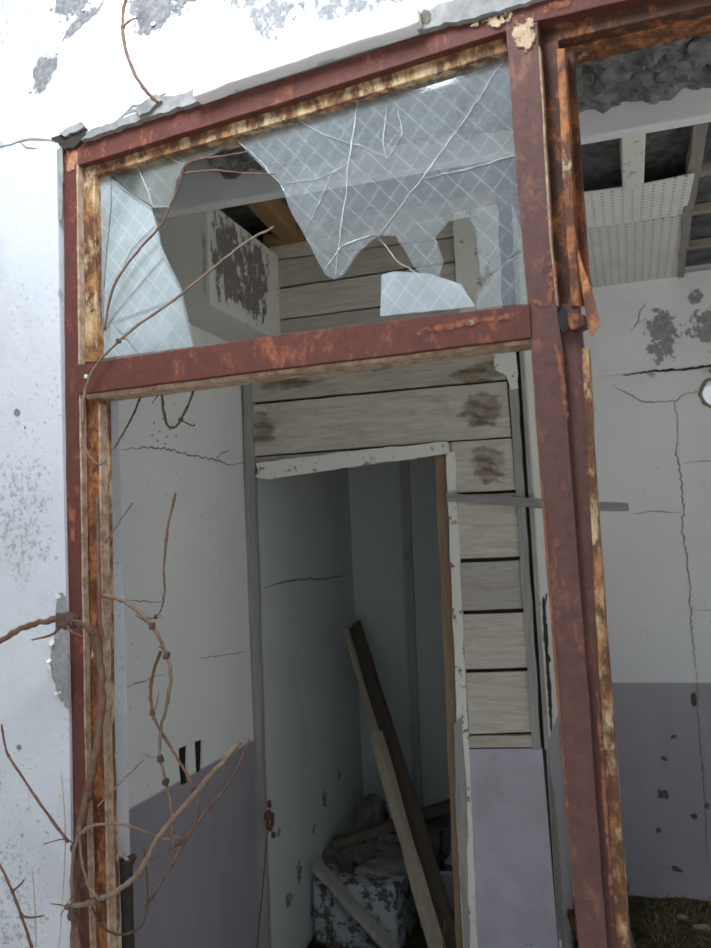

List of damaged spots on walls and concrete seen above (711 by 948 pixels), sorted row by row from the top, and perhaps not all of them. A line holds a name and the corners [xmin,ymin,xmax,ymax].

peeling [49,0,104,38]
peeling [127,0,196,37]
spalling [576,34,711,114]
crack [0,138,53,149]
rust [65,149,78,172]
spalling [206,66,513,179]
rust [417,311,519,334]
rust [554,344,568,417]
crack [122,446,245,466]
crack [612,364,711,860]
spalling [46,593,70,709]
rust [601,764,614,907]